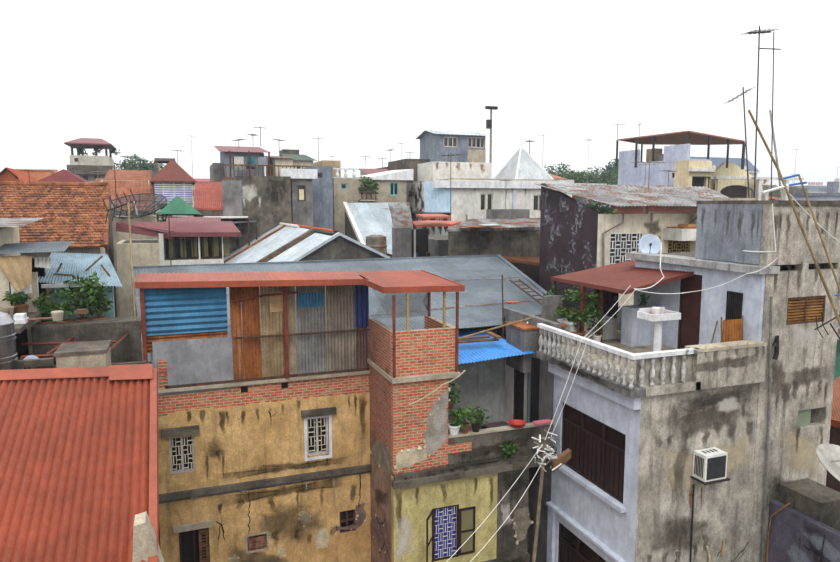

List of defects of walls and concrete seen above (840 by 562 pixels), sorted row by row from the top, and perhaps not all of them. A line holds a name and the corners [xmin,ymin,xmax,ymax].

leakage [686,348,746,370]
leakage [348,397,366,425]
leakage [671,389,754,472]
leakage [251,456,328,474]
leakage [238,479,334,507]
leakage [662,521,707,561]